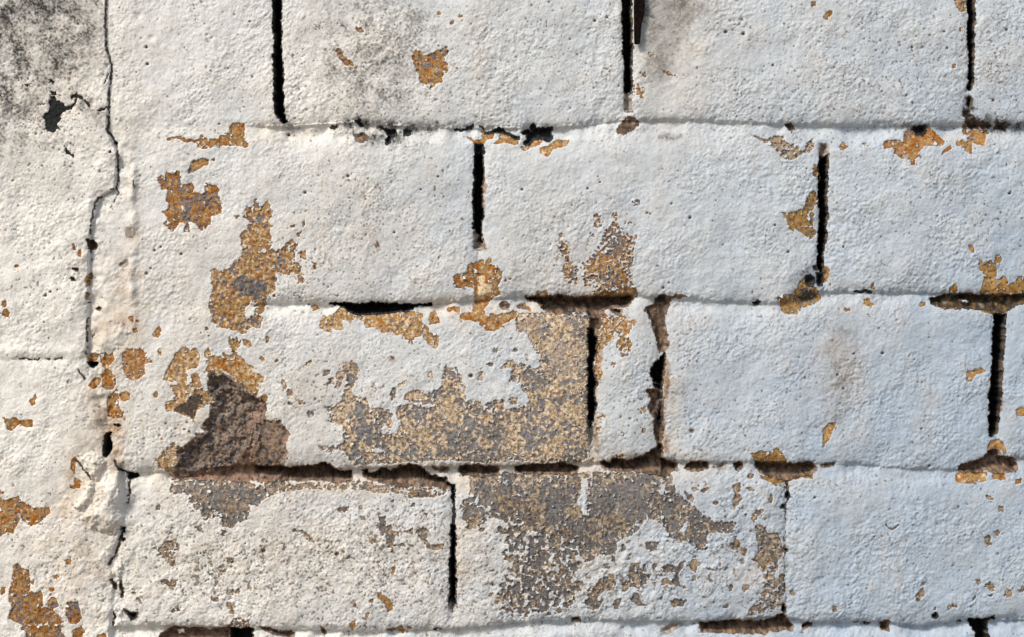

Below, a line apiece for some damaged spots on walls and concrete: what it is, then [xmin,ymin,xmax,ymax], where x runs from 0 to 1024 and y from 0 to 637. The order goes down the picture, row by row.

peeling [412,47,449,88]
peeling [883,121,1008,169]
crack [19,0,135,380]
peeling [157,123,248,232]
peeling [782,191,818,239]
peeling [968,245,1024,296]
peeling [3,416,33,431]
peeling [87,199,836,628]
peeling [0,488,51,537]
crack [70,423,140,626]
peeling [1,564,107,637]
peeling [349,593,393,631]